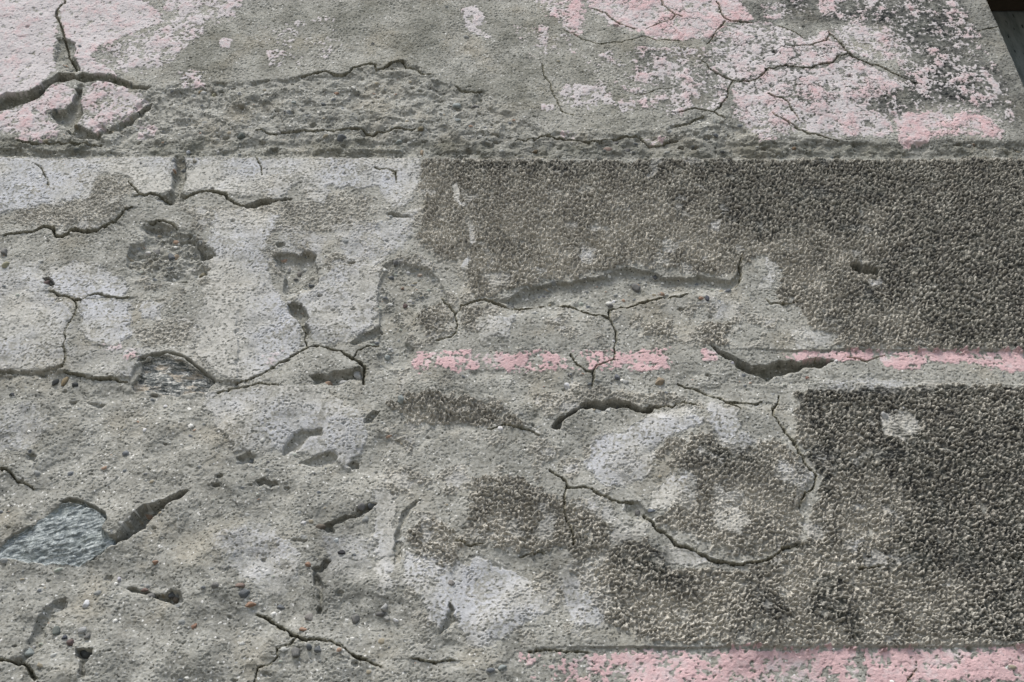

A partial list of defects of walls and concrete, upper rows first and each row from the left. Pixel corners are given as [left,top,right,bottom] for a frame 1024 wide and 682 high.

crack [516,0,920,149]
peeling [535,0,1017,149]
crack [4,180,246,238]
crack [48,289,130,384]
flaking render [132,355,215,397]
crack [217,325,380,395]
crack [436,293,689,387]
peeling [700,344,1024,382]
crack [654,383,819,509]
flaking render [0,489,189,567]
crack [549,468,803,568]
crack [254,612,383,682]